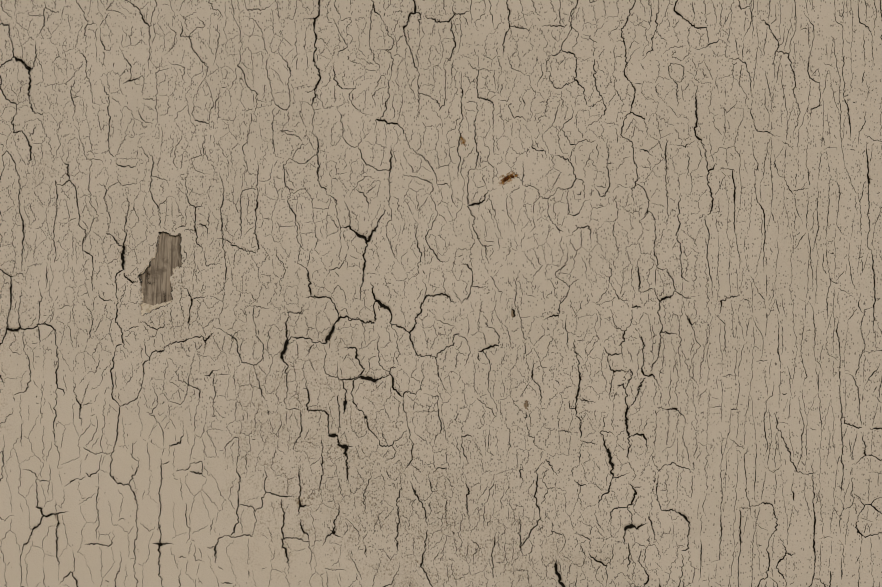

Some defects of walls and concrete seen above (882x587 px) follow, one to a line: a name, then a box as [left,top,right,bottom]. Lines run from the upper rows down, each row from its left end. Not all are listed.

crack [858,0,882,41]
crack [706,98,736,141]
peeling [138,231,183,316]
crack [716,345,744,418]
crack [750,318,767,390]
crack [745,396,757,491]
crack [713,415,731,562]
crack [58,485,128,587]
crack [321,543,344,587]
crack [839,517,860,587]